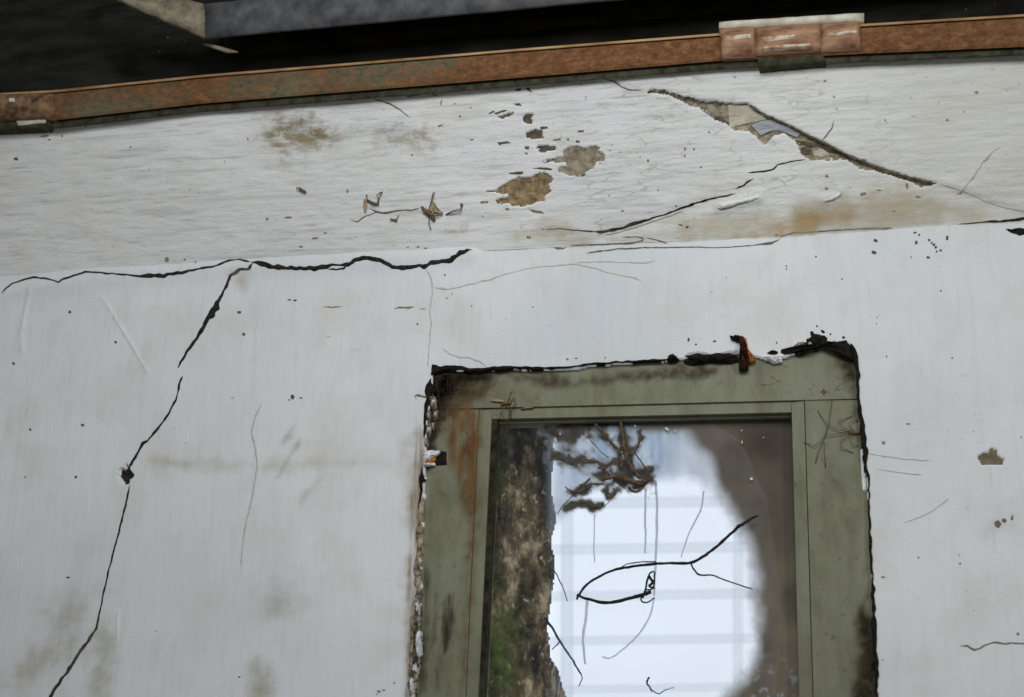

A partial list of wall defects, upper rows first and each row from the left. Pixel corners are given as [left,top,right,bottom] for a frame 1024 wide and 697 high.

water stain [272,118,328,146]
spalling [480,88,621,214]
crack [2,79,1024,467]
rust [744,338,756,364]
crack [241,402,263,564]
rust [447,406,480,513]
spalling [978,448,1005,465]
crack [49,485,130,697]
crack [962,641,1024,651]